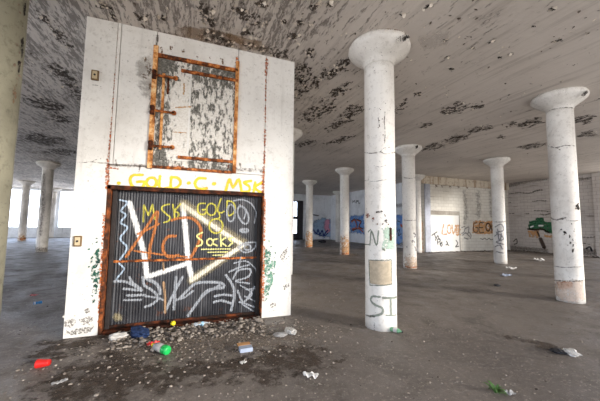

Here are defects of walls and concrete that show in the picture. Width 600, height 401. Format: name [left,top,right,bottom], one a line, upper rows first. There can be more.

peeling [276,0,364,133]
peeling [440,86,493,121]
corrosion [105,74,118,189]
peeling [415,124,493,157]
peeling [505,117,545,129]
peeling [574,109,599,137]
corrosion [97,215,105,322]